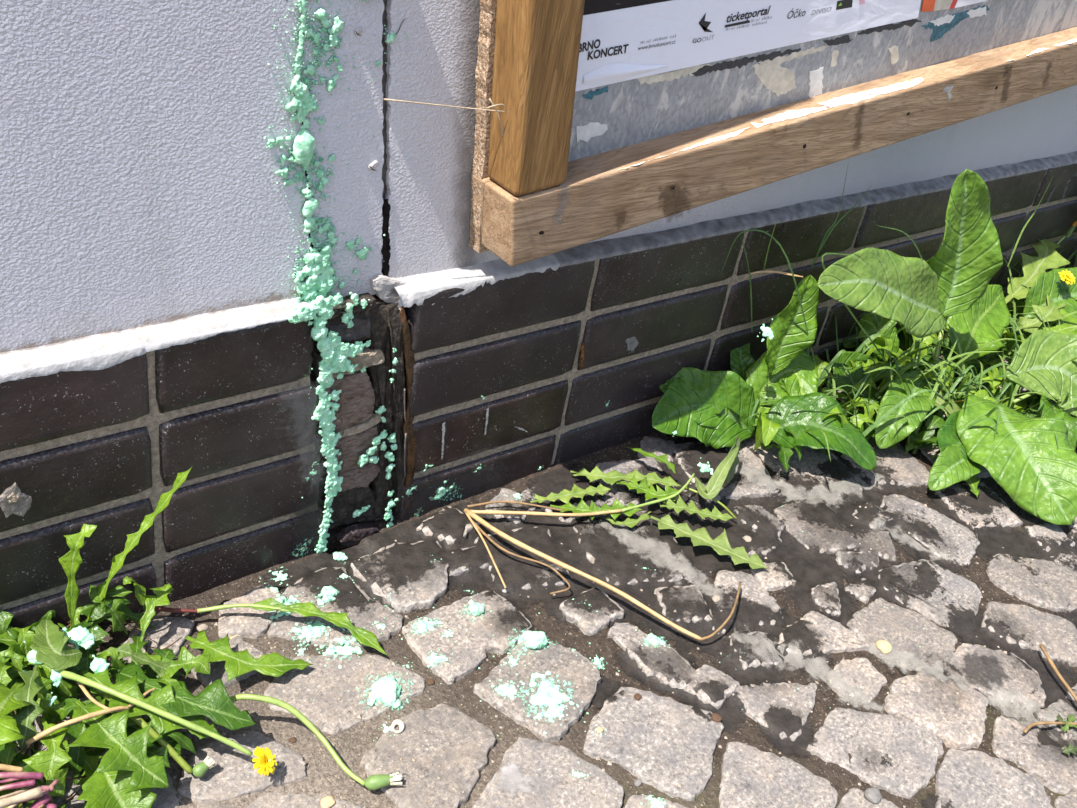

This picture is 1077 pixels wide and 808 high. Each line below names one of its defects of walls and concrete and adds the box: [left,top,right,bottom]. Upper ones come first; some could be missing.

peeling [266,136,291,149]
peeling [303,8,343,92]
crack [381,0,391,276]
spalling [0,151,1077,529]